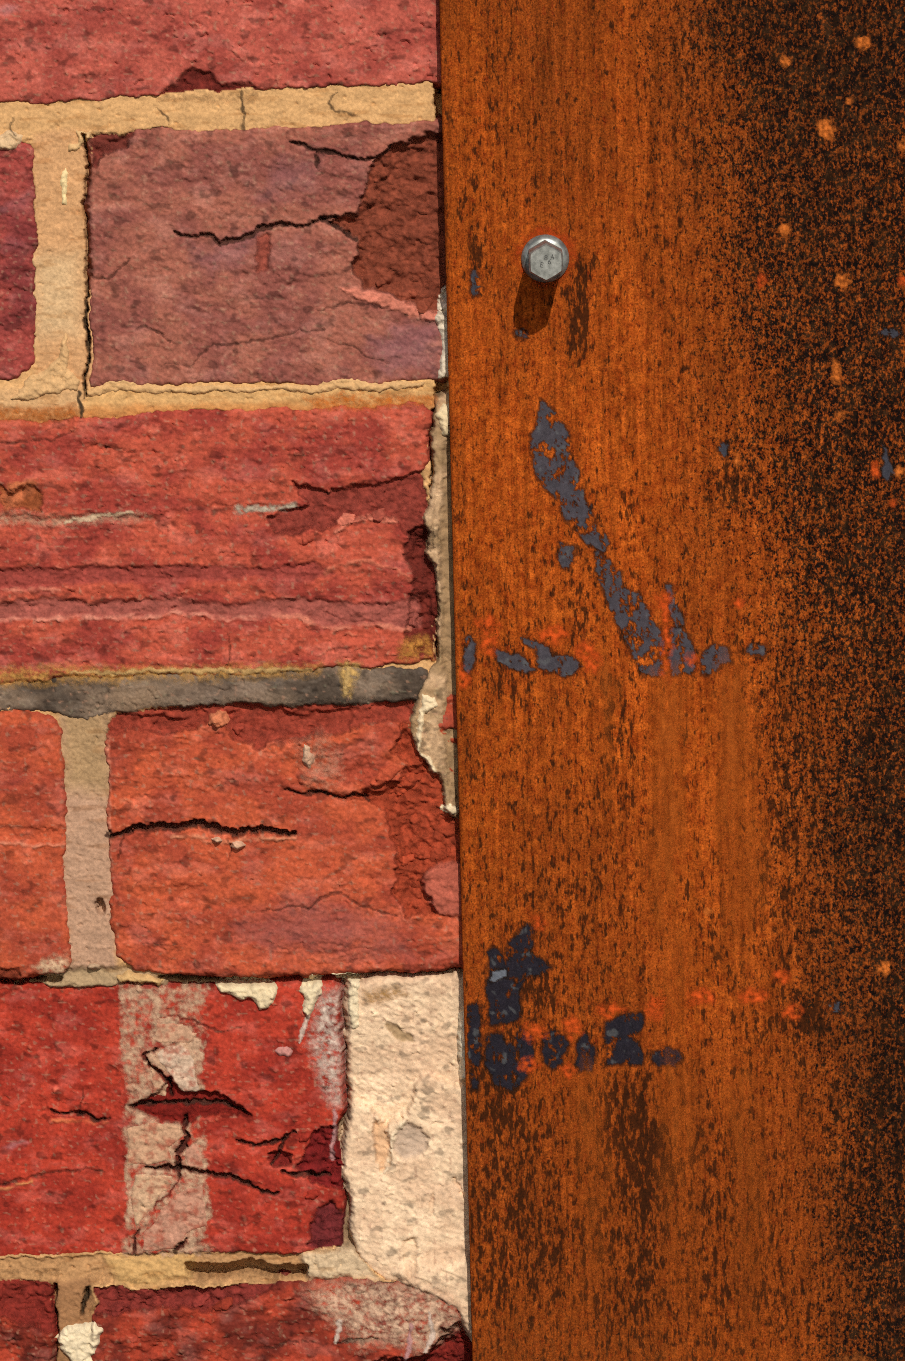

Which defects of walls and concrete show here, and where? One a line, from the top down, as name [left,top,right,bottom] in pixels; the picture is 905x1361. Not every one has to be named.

rust [817,120,833,139]
crack [174,216,358,246]
rust [517,228,576,285]
peeling [530,401,732,677]
rust [540,627,568,642]
peeling [746,643,766,657]
rust [659,595,676,751]
crack [287,788,370,801]
crack [105,819,297,838]
peeling [467,923,683,1091]
crack [51,1047,331,1195]
crack [173,1240,186,1254]